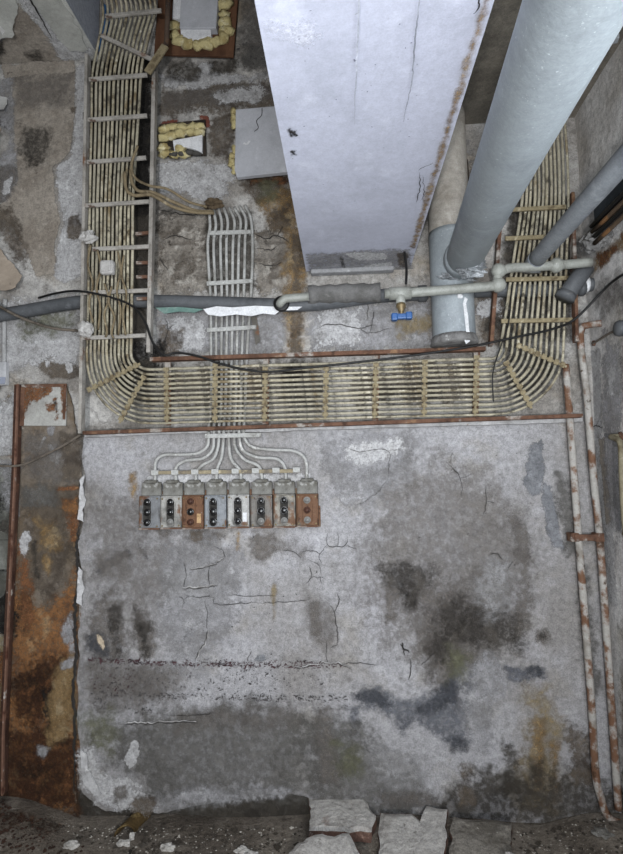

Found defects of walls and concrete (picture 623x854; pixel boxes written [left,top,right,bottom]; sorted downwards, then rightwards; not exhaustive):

water stain [1,60,75,78]
flaking render [0,0,88,64]
spalling [0,64,91,283]
crack [353,0,361,124]
crack [403,0,420,122]
corrosion [410,0,487,248]
corrosion [0,384,84,816]
crack [181,533,353,660]
crack [295,594,370,669]
water stain [73,468,623,825]